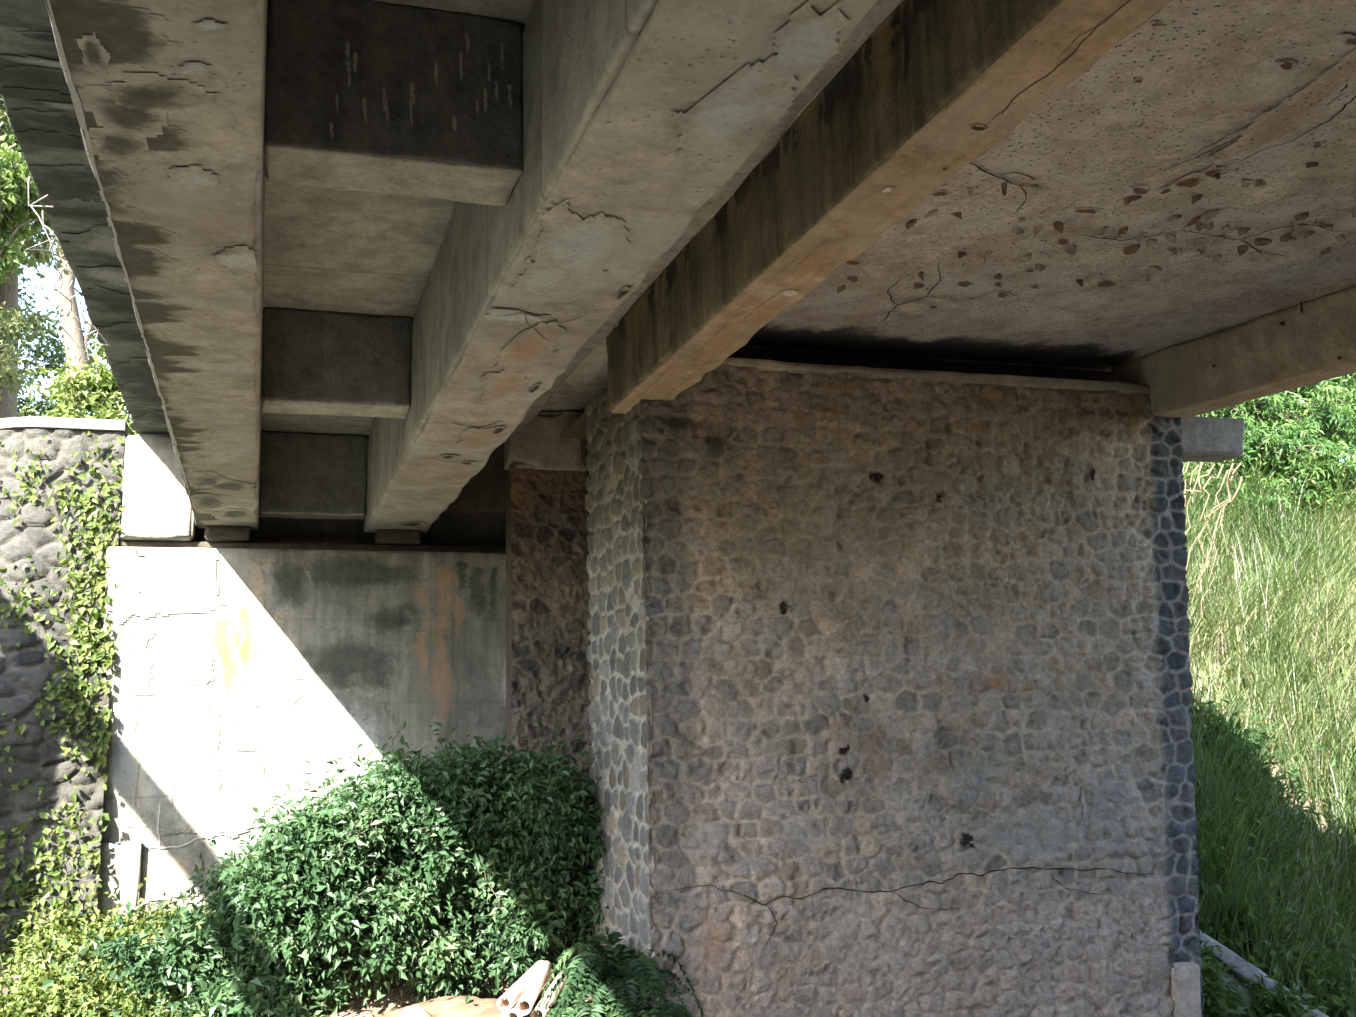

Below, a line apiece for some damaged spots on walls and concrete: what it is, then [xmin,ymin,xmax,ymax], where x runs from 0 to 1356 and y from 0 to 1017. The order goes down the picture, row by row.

crack [1148,84,1356,176]
leakage [0,0,258,521]
peeling [905,210,962,230]
crack [881,264,1019,322]
peeling [1012,207,1076,255]
peeling [1099,166,1346,282]
corrosion [207,585,258,717]
leakage [107,548,437,828]
corrosion [406,558,467,763]
leakage [453,560,512,741]
crack [676,867,1172,947]